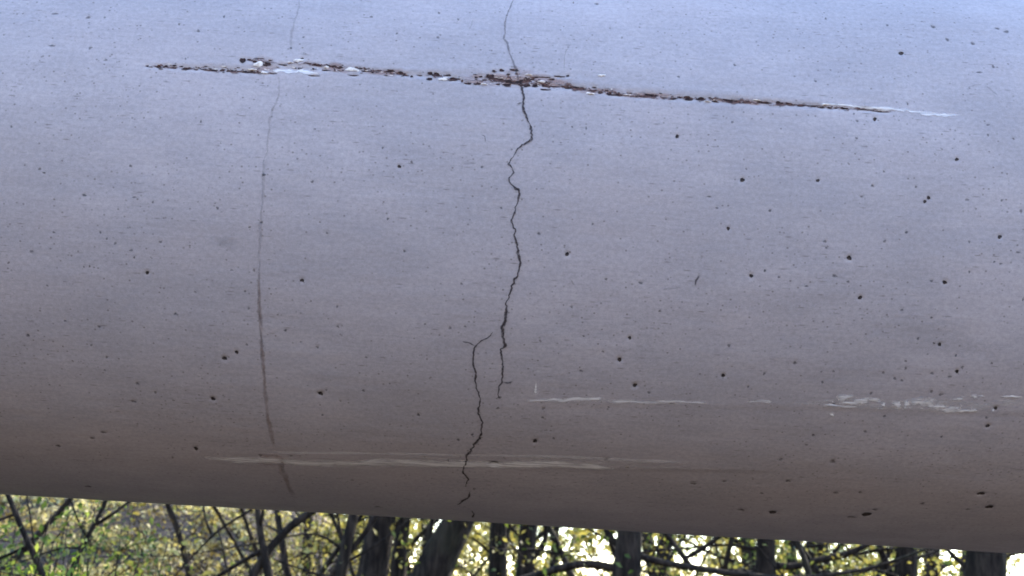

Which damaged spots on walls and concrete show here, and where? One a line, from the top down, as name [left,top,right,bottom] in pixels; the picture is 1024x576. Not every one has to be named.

crack [457,48,533,518]
spalling [146,58,891,112]